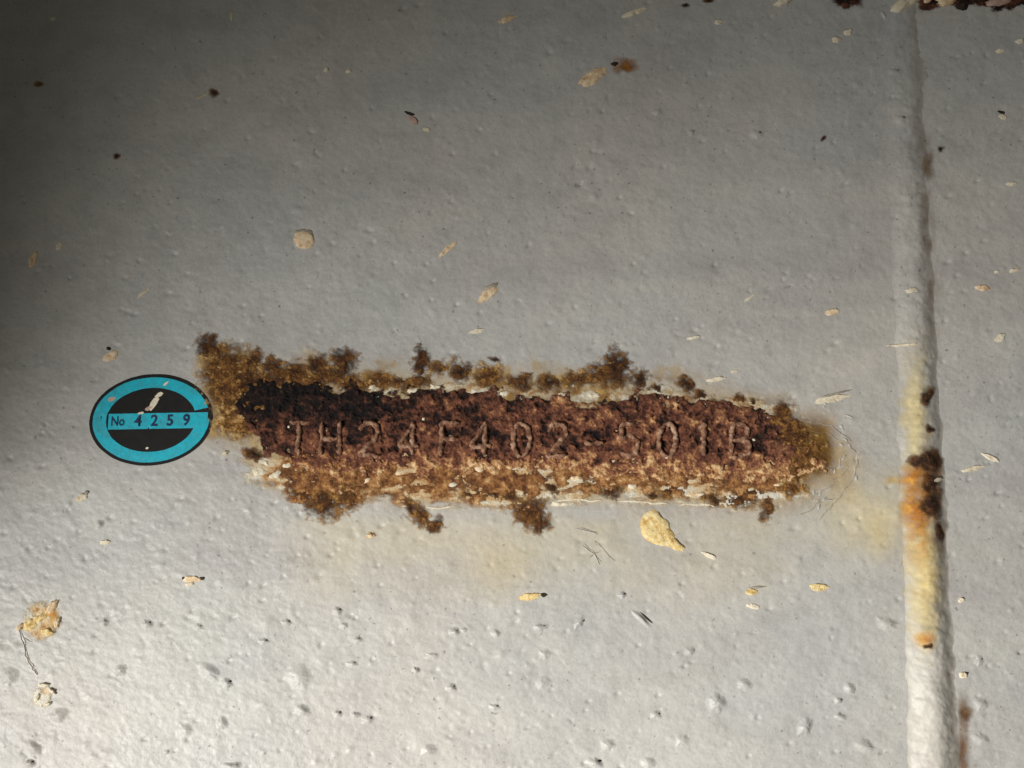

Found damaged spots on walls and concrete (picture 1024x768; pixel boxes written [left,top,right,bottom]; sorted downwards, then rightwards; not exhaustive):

rust [194,333,861,534]
rust [891,375,944,648]